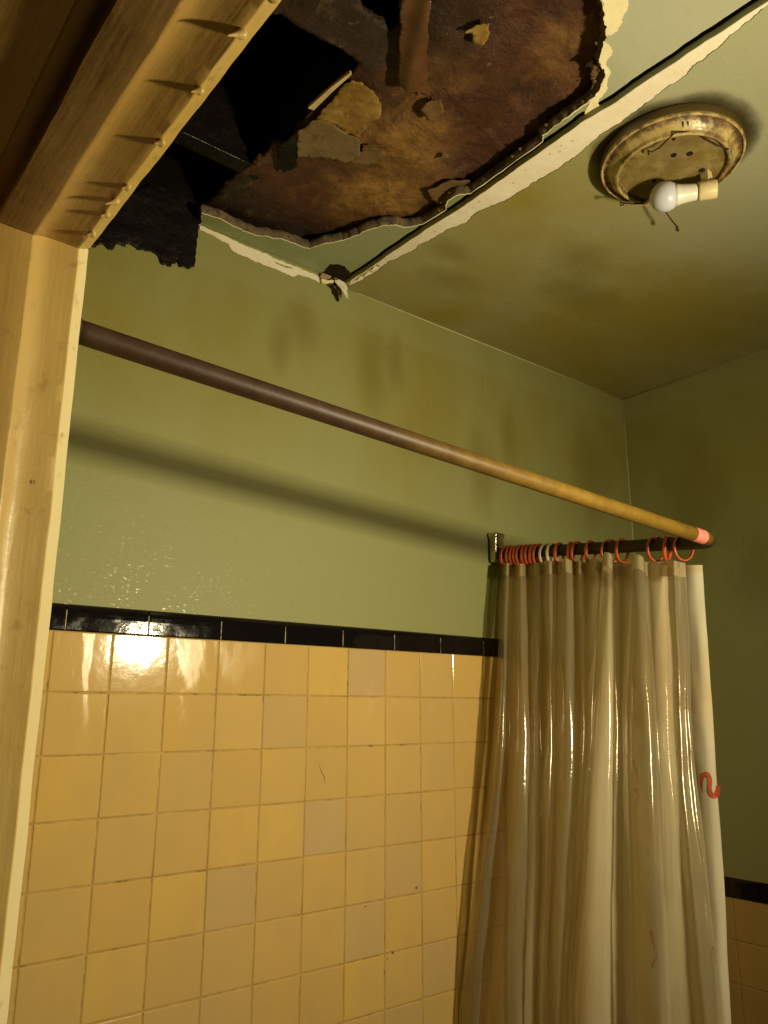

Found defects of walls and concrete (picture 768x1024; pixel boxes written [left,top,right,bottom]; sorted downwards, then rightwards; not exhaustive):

peeling [198,0,768,302]